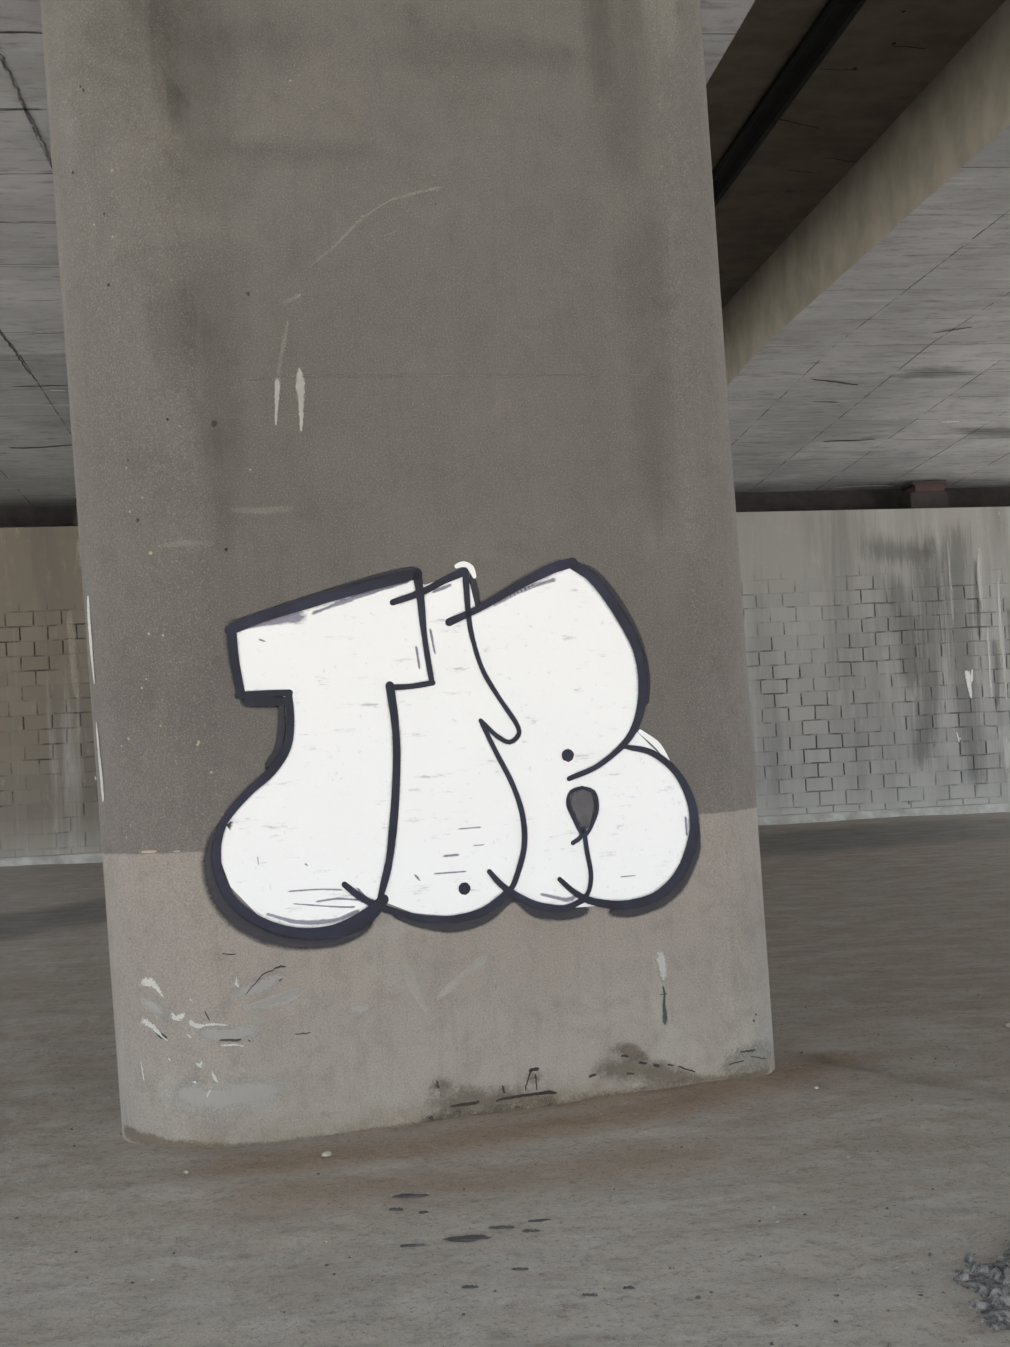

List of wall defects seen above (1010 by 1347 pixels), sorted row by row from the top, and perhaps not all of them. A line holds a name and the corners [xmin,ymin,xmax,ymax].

crack [0,31,53,174]
crack [0,332,68,387]
crack [10,443,70,451]